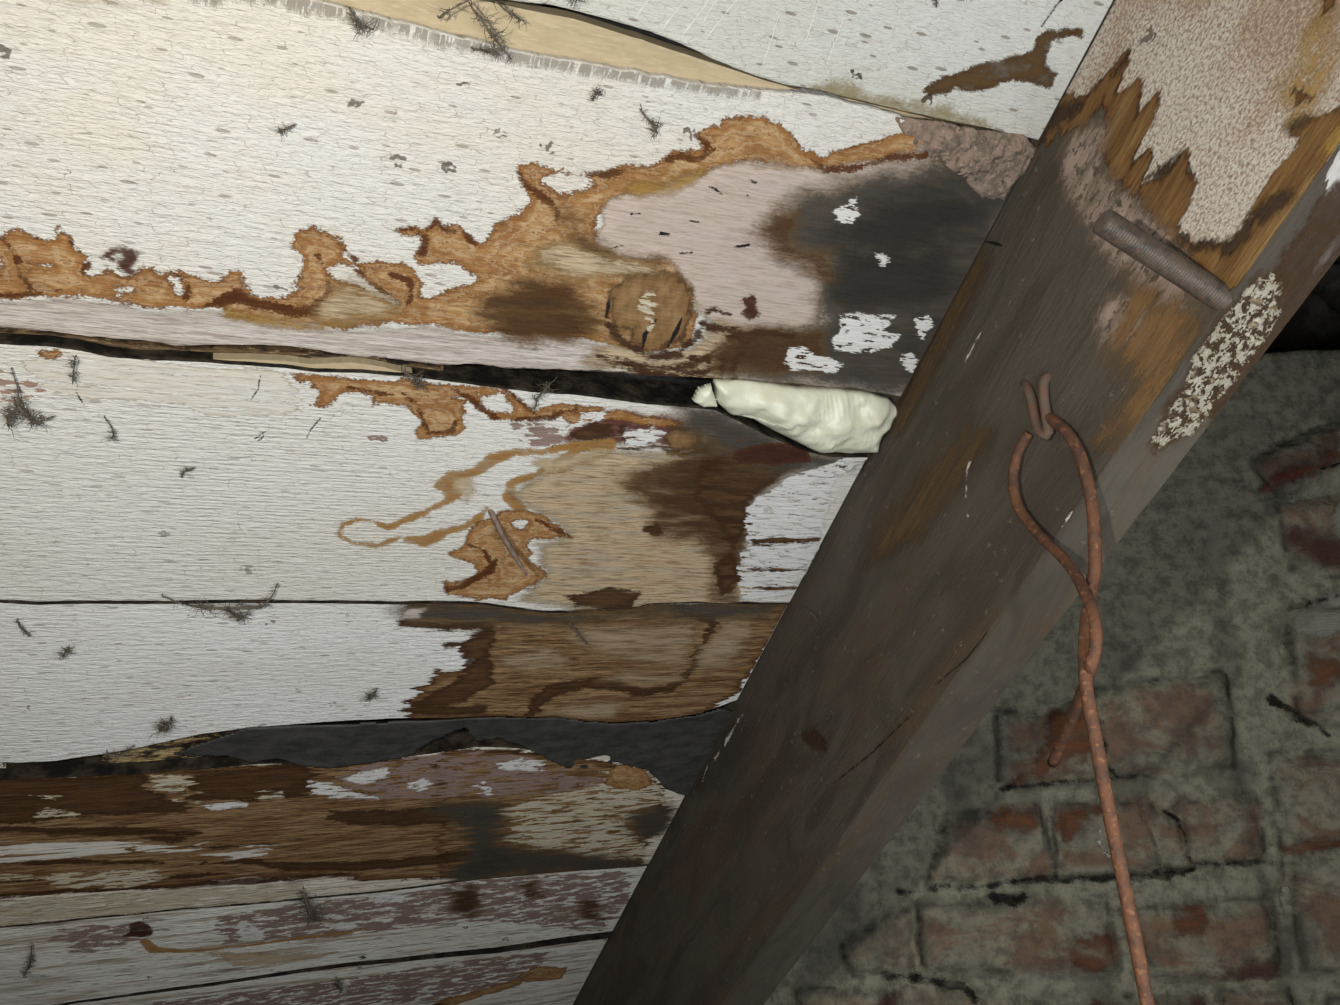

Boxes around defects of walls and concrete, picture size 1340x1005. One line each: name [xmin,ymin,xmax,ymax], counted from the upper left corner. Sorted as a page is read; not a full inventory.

peeling [0,151,938,378]
damp [813,0,1340,442]
peeling [1062,0,1340,347]
peeling [0,370,46,402]
damp [0,115,1016,722]
peeling [510,423,566,447]
peeling [511,452,867,610]
crack [1266,693,1331,738]
damp [0,748,671,927]